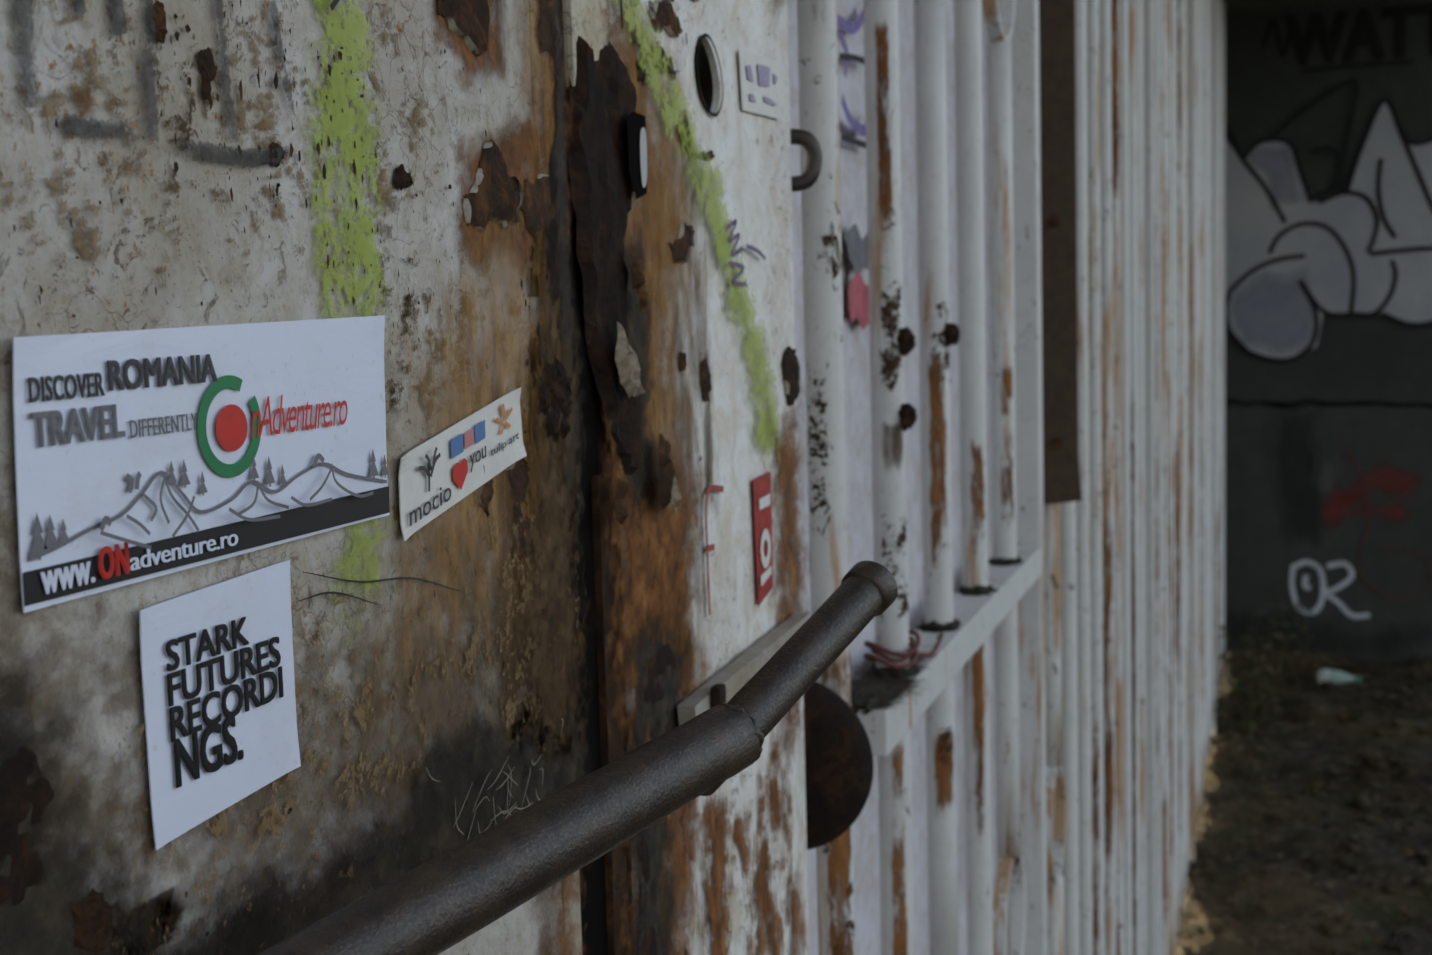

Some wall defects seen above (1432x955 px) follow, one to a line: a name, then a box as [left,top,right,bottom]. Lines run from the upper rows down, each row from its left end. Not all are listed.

corrosion [928,301,951,564]
corrosion [827,828,855,955]